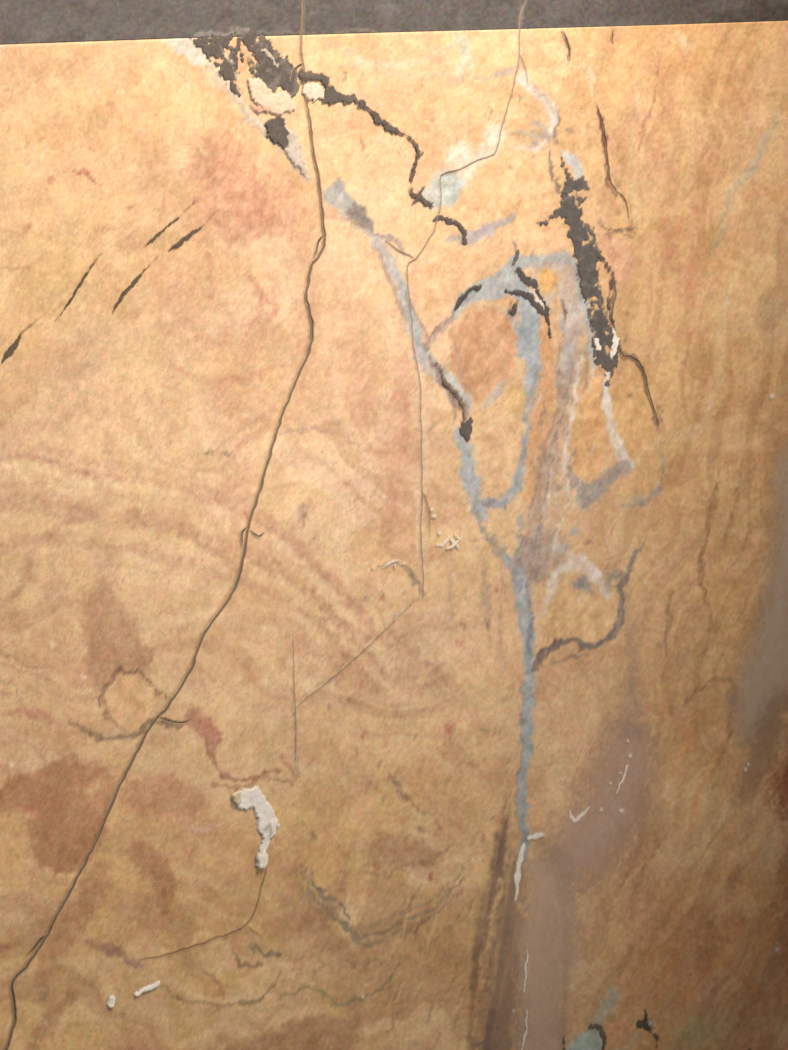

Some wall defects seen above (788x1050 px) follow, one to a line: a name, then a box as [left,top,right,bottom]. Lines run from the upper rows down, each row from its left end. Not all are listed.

peeling [190,30,467,245]
peeling [540,156,620,386]
crack [5,0,326,1050]
peeling [232,786,280,869]
peeling [589,1023,607,1050]
peeling [636,1010,659,1048]